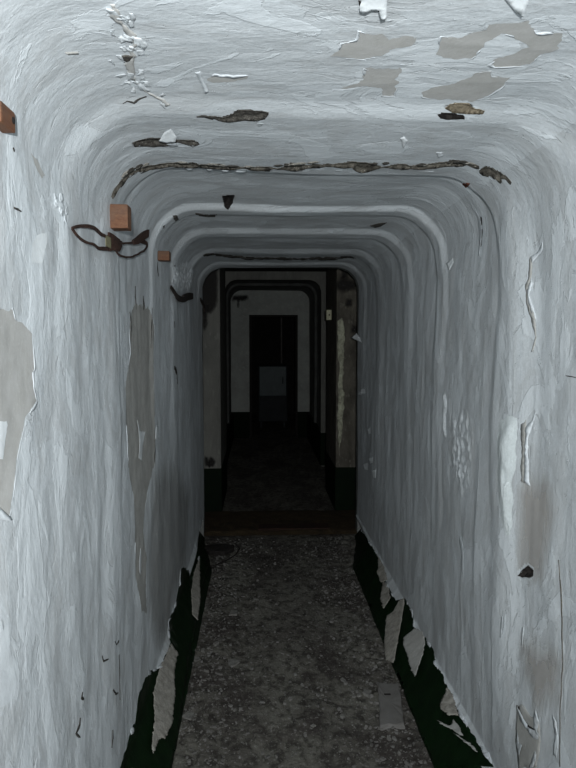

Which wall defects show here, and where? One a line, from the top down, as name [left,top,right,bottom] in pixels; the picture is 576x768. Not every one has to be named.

peeling [358,0,387,20]
peeling [106,4,170,109]
peeling [287,30,416,97]
peeling [420,0,562,120]
spalling [132,129,199,147]
spalling [196,109,269,126]
crack [111,160,512,199]
peeling [0,307,37,521]
peeling [520,412,536,486]
peeling [120,532,209,768]
peeling [354,529,493,768]
peeling [515,704,541,768]